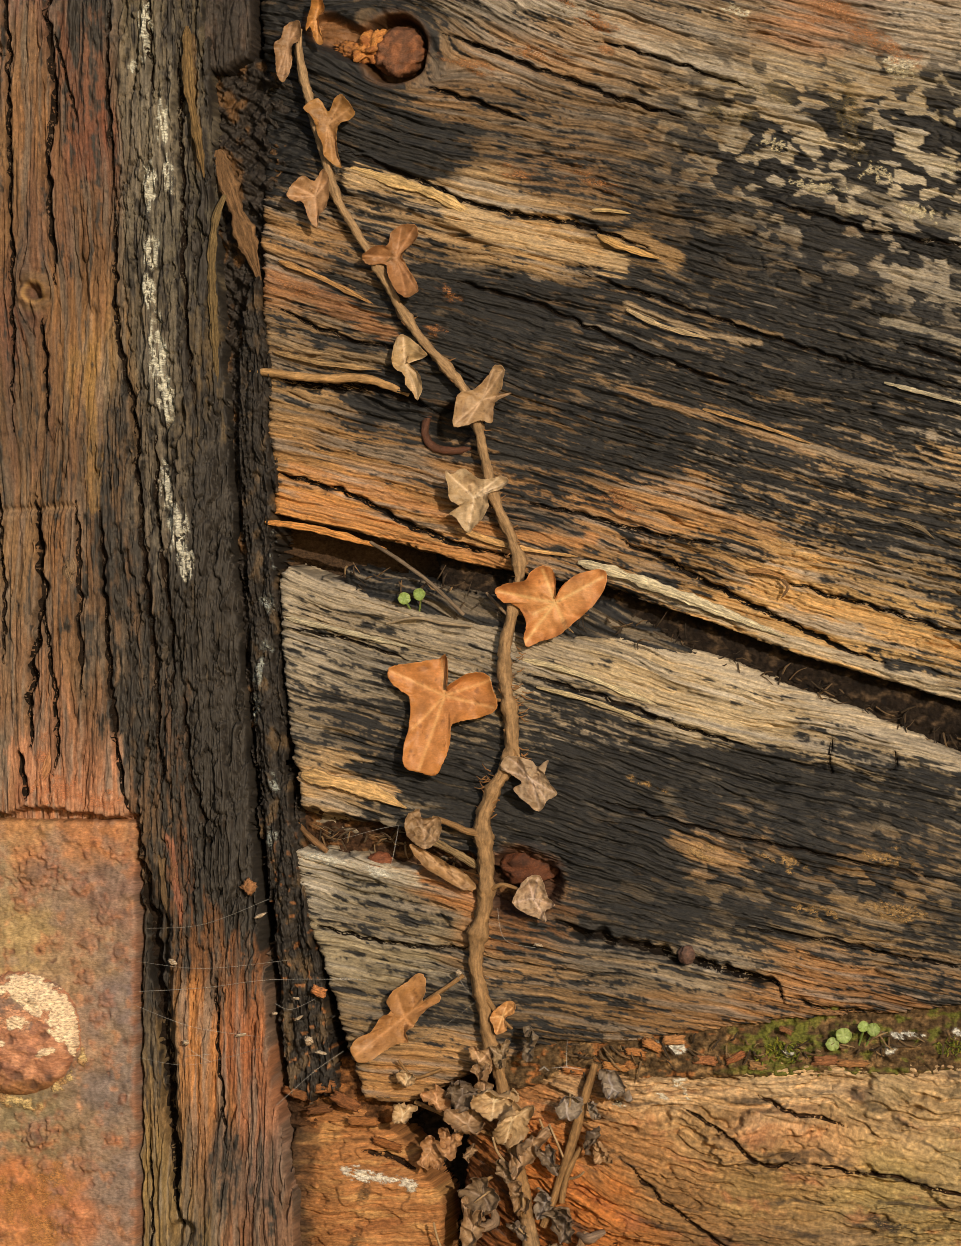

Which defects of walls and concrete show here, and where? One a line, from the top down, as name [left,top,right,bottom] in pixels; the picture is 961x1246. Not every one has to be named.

crack [0,0,213,1246]
crack [758,1095,848,1128]
crack [685,1109,961,1196]
crack [624,1162,726,1246]